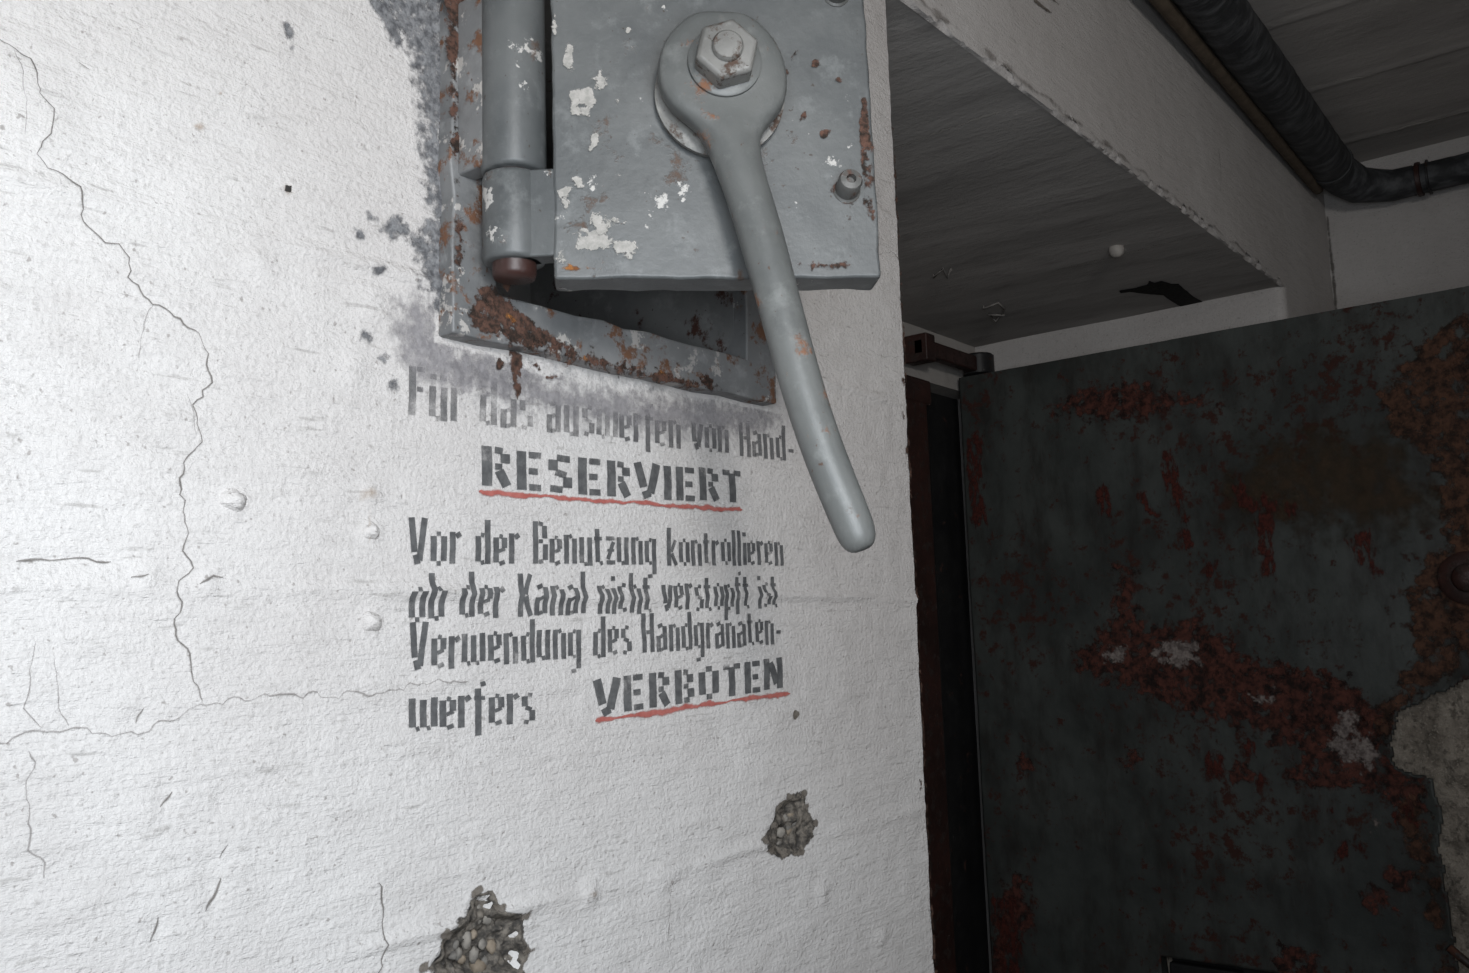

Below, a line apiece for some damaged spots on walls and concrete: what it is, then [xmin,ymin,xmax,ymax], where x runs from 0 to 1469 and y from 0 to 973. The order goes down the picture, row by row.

rust [444,0,463,156]
peeling [356,211,424,249]
rust [454,219,465,272]
crack [1,40,213,701]
rust [1070,563,1432,823]
spalling [761,790,818,860]
spalling [419,885,535,973]